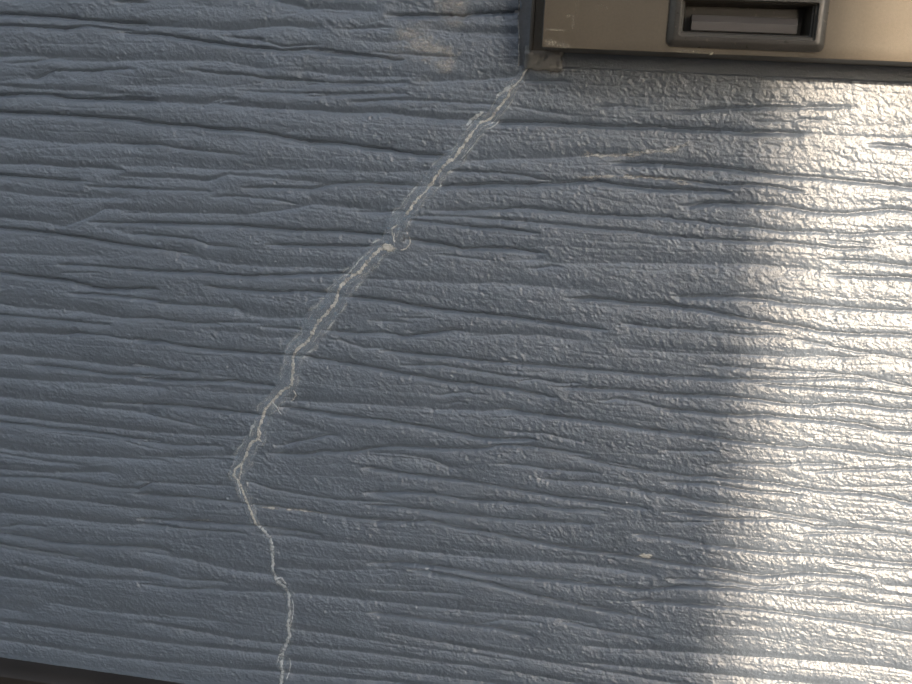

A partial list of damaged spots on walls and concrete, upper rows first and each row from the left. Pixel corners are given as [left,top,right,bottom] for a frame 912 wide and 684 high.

crack [229,69,529,684]